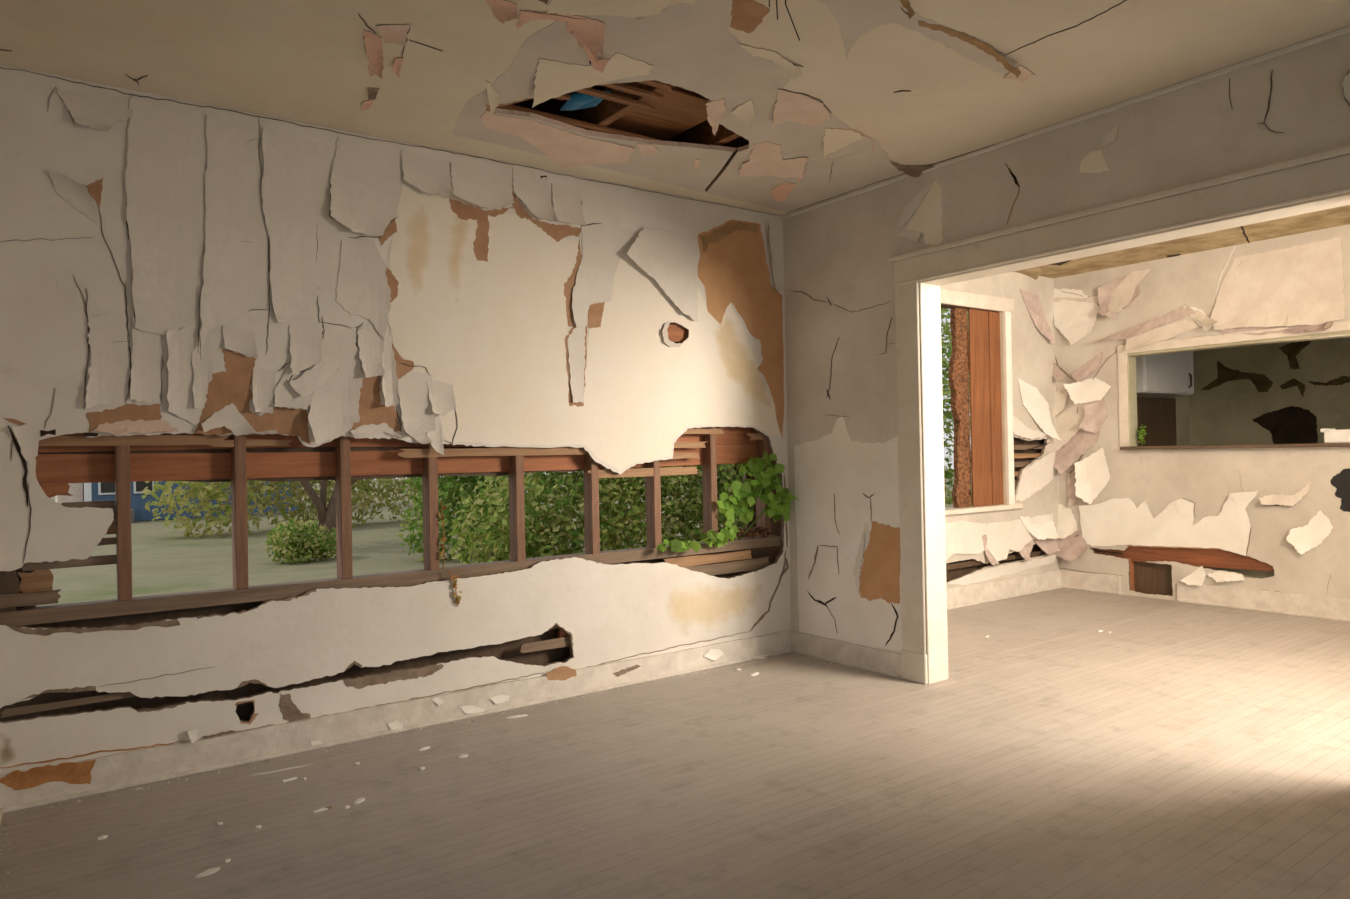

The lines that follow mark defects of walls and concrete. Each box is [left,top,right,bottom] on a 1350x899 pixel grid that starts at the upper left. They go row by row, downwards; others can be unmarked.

peeling [358,13,443,111]
peeling [480,0,696,168]
peeling [738,43,874,202]
crack [1004,0,1127,56]
crack [1342,67,1350,106]
crack [0,49,1028,357]
peeling [49,98,902,654]
peeling [945,237,1350,586]
crack [588,493,874,667]
flaking render [279,694,310,721]
flaking render [343,661,446,689]
peeling [613,665,641,677]